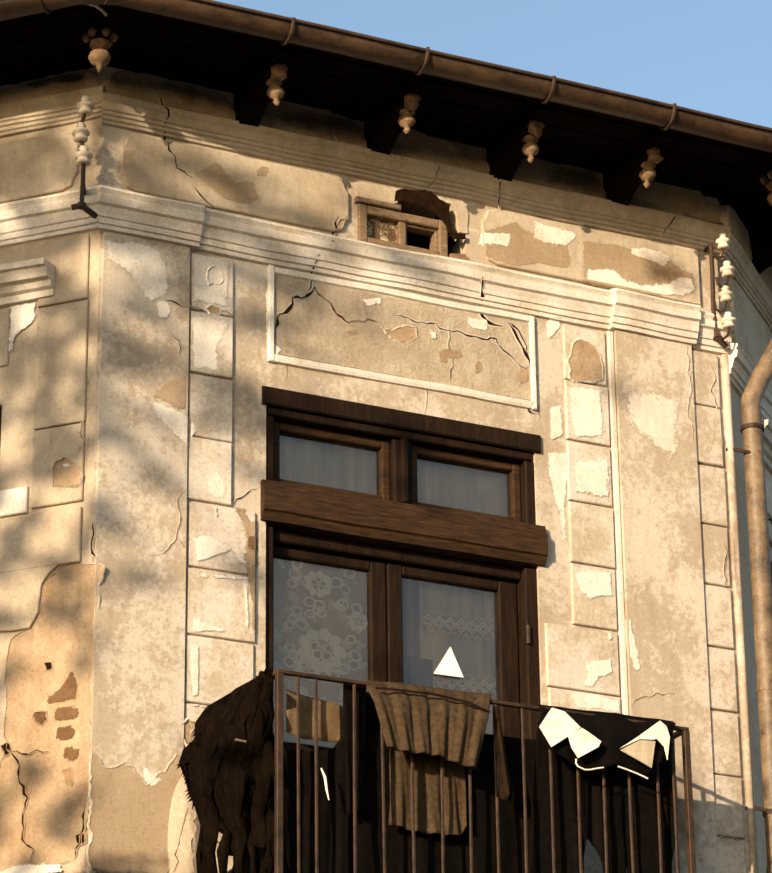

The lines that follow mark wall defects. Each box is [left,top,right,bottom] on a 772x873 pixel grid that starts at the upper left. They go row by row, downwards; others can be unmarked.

peeling [104,240,171,318]
crack [152,89,215,210]
peeling [190,254,230,371]
spalling [195,163,269,205]
crack [274,215,541,418]
spalling [448,201,468,240]
spalling [477,221,696,296]
peeling [550,338,604,439]
peeling [625,387,683,459]
peeling [192,505,259,634]
spalling [0,561,196,873]
crack [5,747,48,862]